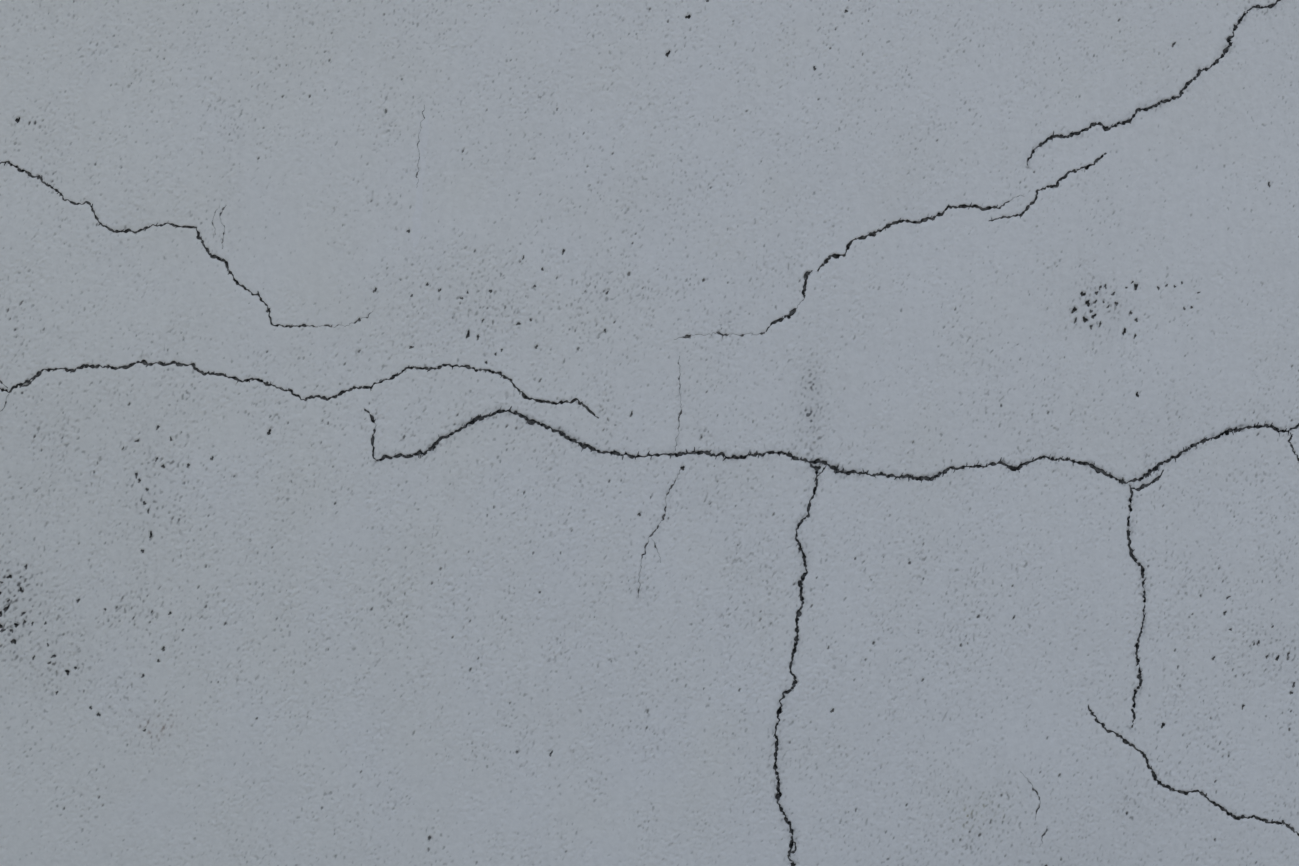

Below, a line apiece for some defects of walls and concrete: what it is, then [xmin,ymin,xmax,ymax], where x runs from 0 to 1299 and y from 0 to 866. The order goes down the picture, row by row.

crack [1027,0,1281,166]
crack [0,161,373,328]
crack [674,153,1107,340]
crack [0,358,1299,866]